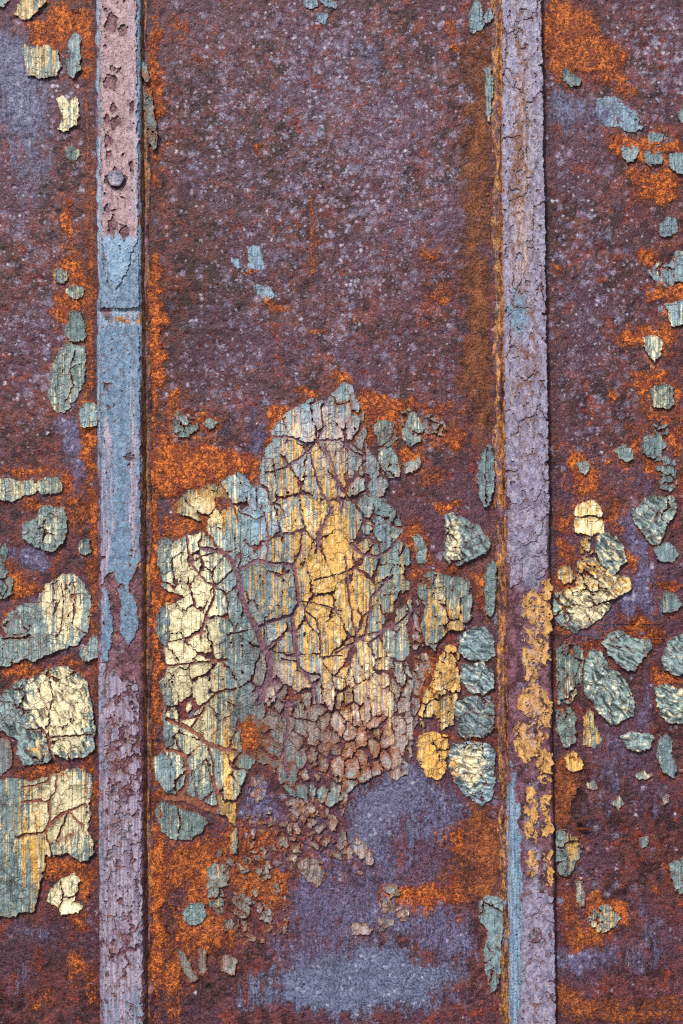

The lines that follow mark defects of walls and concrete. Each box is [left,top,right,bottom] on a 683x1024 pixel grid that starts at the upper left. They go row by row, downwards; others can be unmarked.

peeling [21,32,82,79]
rust [24,0,97,406]
peeling [56,95,80,133]
peeling [99,0,159,309]
rust [329,0,493,487]
rust [541,0,637,102]
rust [1,426,98,638]
crack [15,667,92,858]
rust [144,253,291,1024]
peeling [0,267,497,1024]
crack [161,398,412,814]
peeling [469,0,683,1024]